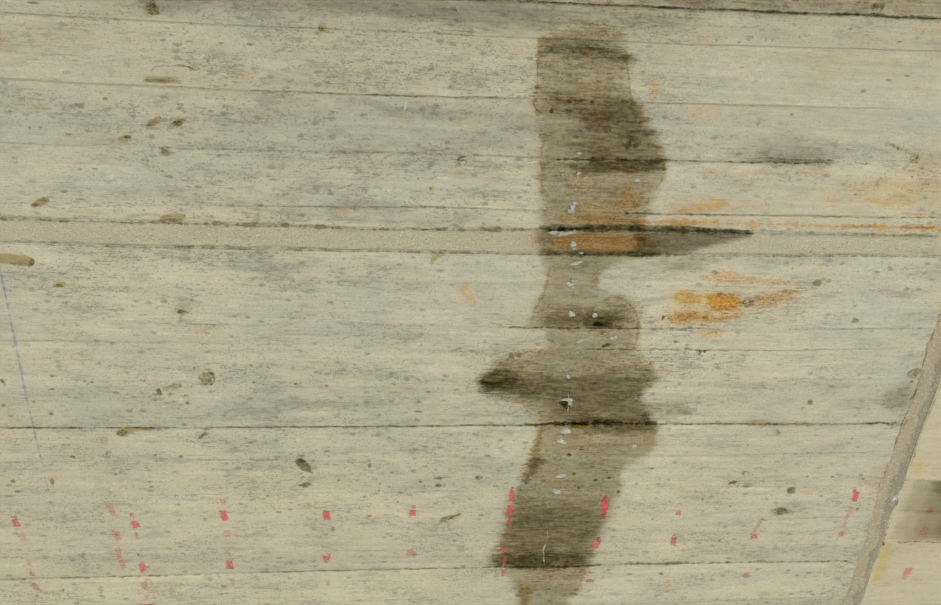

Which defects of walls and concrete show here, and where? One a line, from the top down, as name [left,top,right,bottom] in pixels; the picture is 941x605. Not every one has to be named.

leakage [548,225,750,265]